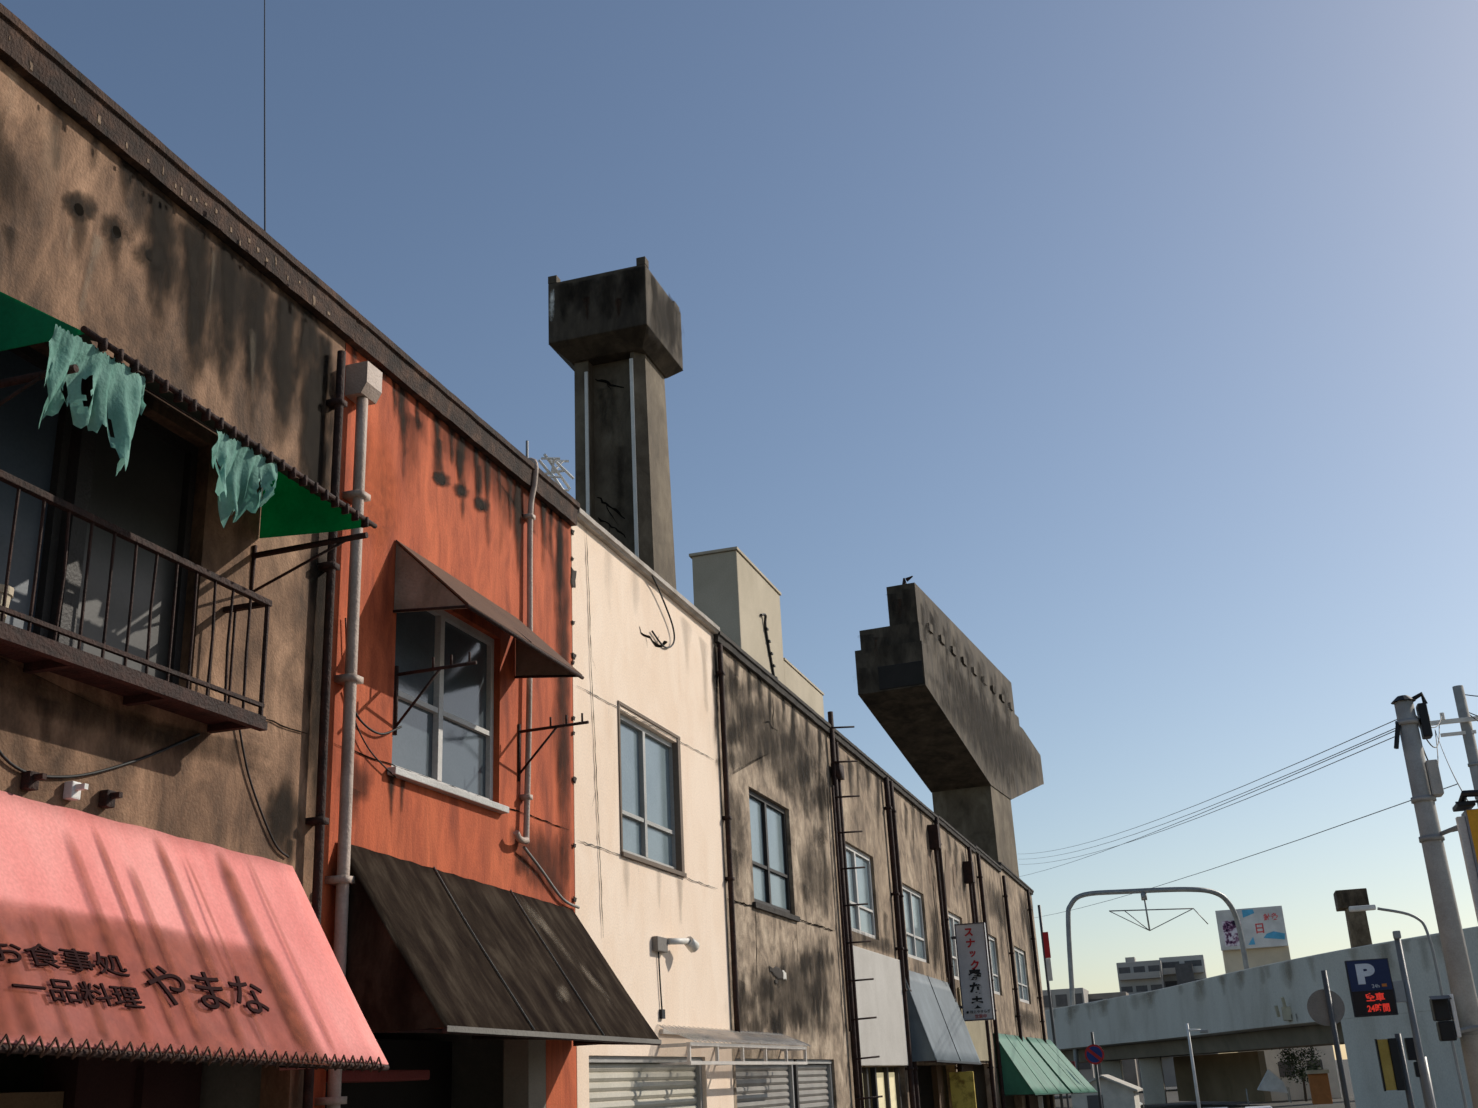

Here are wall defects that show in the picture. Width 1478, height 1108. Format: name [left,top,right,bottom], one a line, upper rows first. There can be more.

water stain [64,192,124,246]
water stain [123,159,335,489]
crack [595,379,624,391]
water stain [550,268,681,354]
water stain [353,347,569,811]
water stain [308,558,326,795]
crack [266,497,833,962]
water stain [712,637,822,809]
water stain [848,757,880,815]
water stain [889,589,1037,789]
water stain [740,949,833,1034]
water stain [989,887,1036,985]